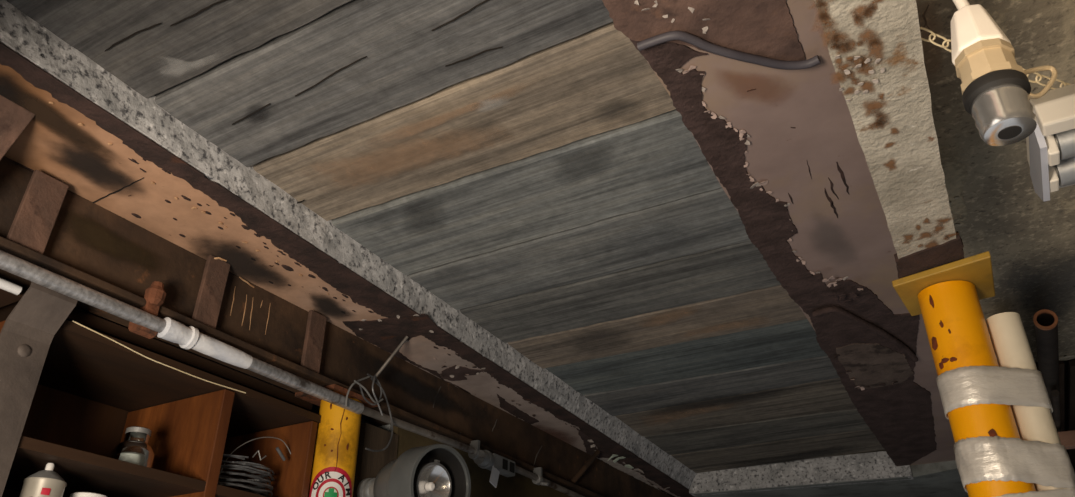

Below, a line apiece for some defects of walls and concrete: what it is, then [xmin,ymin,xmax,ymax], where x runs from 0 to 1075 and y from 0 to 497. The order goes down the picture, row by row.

corrosion [812,0,898,170]
peeling [0,42,694,497]
peeling [602,0,937,466]
corrosion [902,218,957,248]
peeling [932,320,957,369]